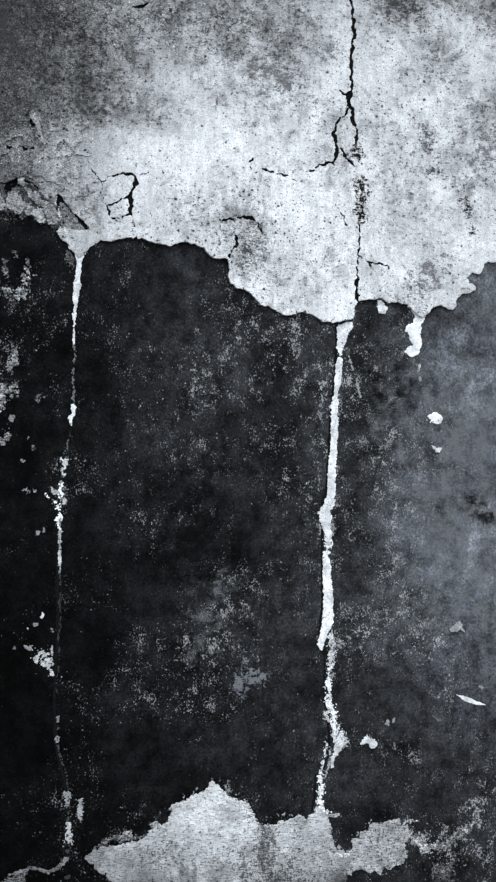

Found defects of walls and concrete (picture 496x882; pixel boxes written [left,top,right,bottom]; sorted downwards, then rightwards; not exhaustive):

crack [6,120,35,151]
crack [249,0,358,180]
crack [91,169,149,239]
flaking render [0,176,496,323]
crack [335,204,389,303]
flaking render [0,343,22,446]
damp [317,322,353,556]
flaking render [13,645,54,676]
damp [315,630,349,814]
peeling [360,735,378,749]
flaking render [1,857,70,882]
spalling [85,778,493,882]